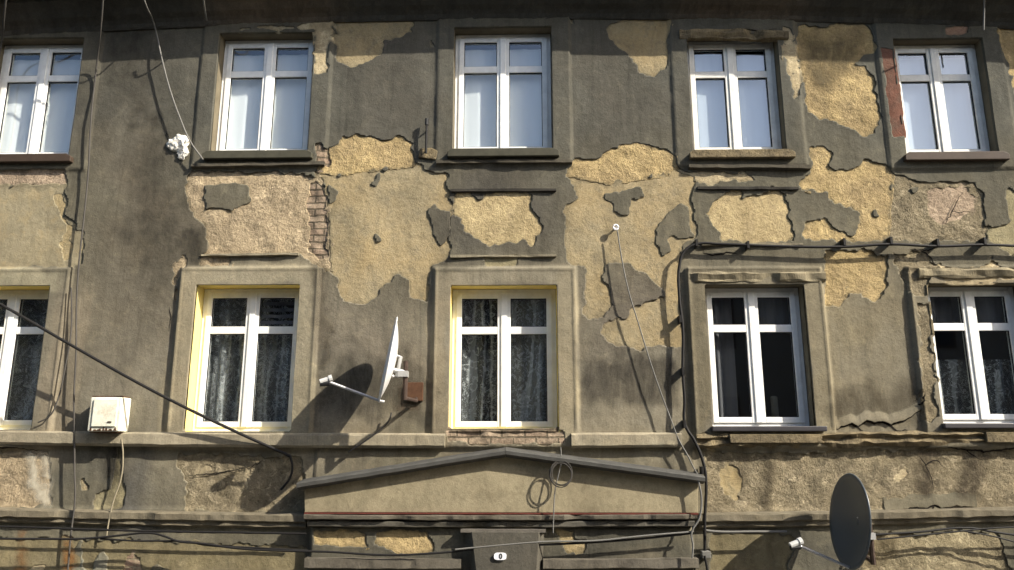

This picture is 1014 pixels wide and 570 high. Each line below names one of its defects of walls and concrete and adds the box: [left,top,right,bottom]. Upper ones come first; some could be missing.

peeling [239,21,414,74]
peeling [606,19,673,77]
peeling [781,23,906,138]
spalling [945,26,968,35]
peeling [997,28,1014,88]
peeling [0,169,84,269]
peeling [185,134,543,304]
spalling [171,255,187,301]
peeling [563,142,1014,423]
crack [835,389,926,431]
spalling [0,448,52,508]